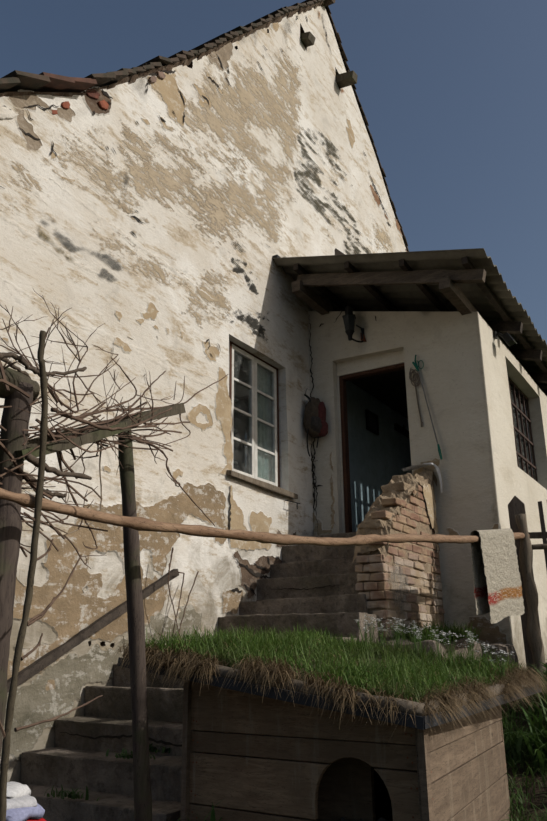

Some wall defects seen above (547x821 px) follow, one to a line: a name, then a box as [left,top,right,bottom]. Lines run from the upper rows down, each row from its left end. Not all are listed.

peeling [8,42,303,252]
leakage [55,233,80,251]
leakage [93,252,122,282]
peeling [100,233,233,328]
leakage [232,258,259,294]
peeling [369,184,403,252]
peeling [135,301,170,340]
leakage [227,309,269,341]
flaking render [186,340,233,476]
flaking render [136,467,296,648]
flaking render [0,518,129,762]
crack [59,732,182,747]